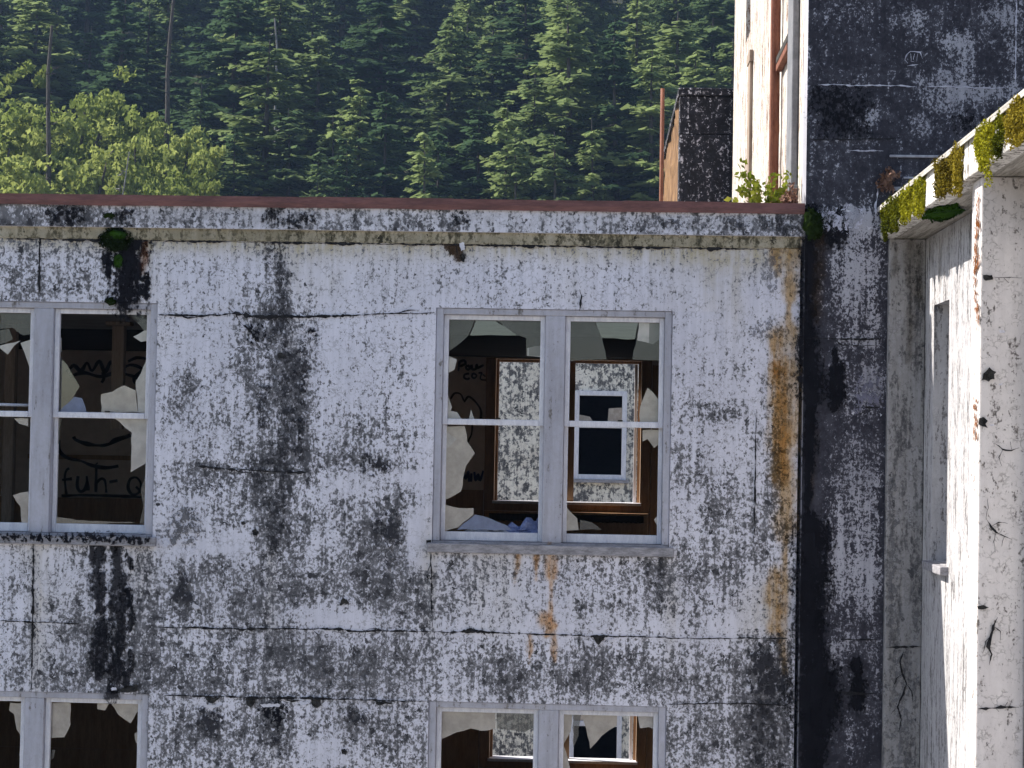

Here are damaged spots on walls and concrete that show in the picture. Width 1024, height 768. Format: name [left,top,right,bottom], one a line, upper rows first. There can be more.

leakage [100,207,155,324]
leakage [261,208,316,229]
crack [158,310,435,338]
crack [199,465,308,474]
leakage [243,241,311,555]
corrosion [766,248,803,634]
leakage [722,203,869,768]
spalling [982,367,1003,385]
crack [986,499,1010,552]
leakage [0,531,150,704]
crack [162,554,787,652]
crack [983,617,1001,664]